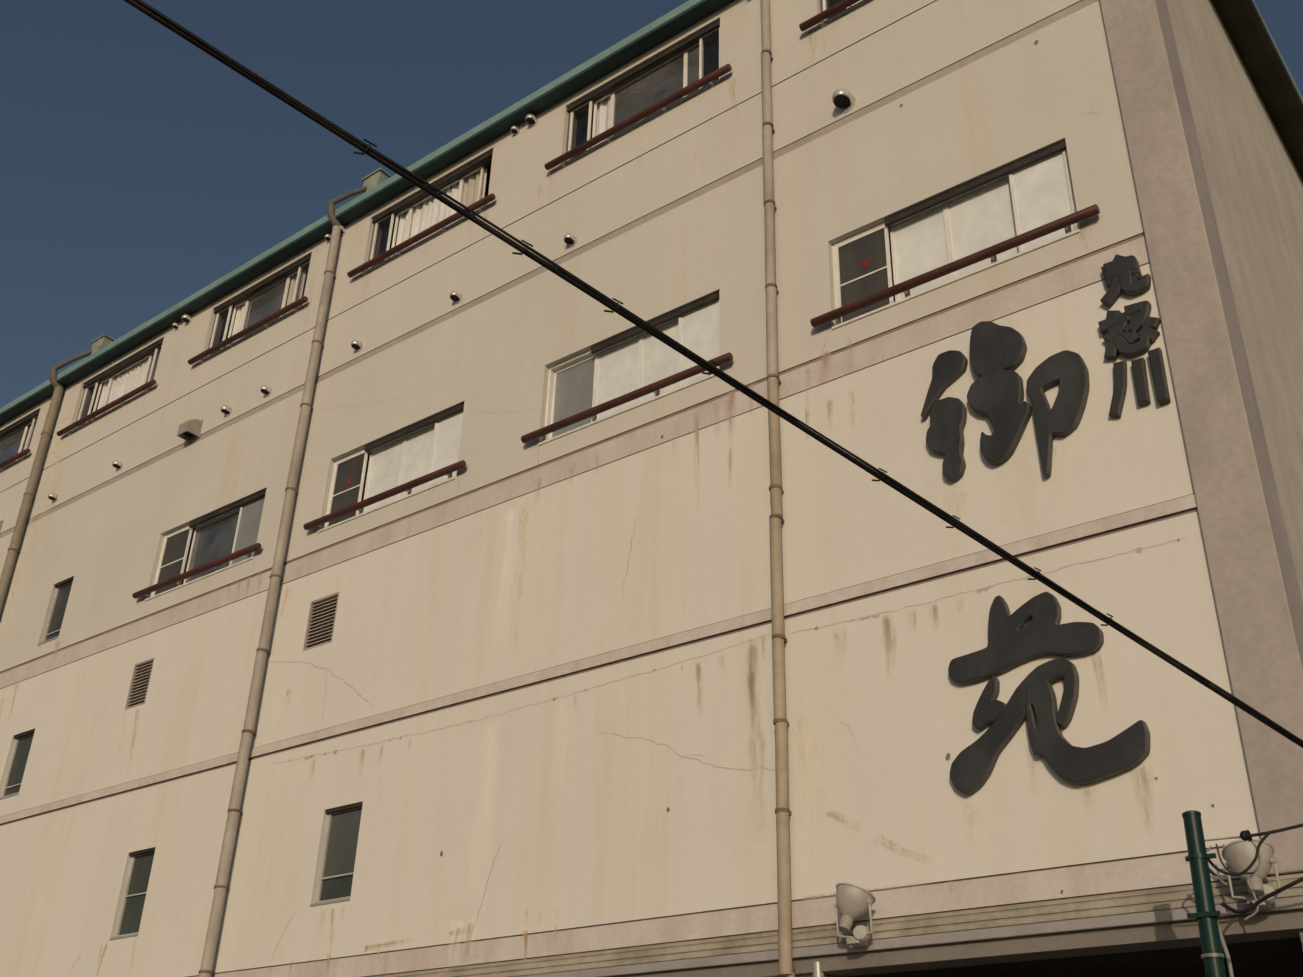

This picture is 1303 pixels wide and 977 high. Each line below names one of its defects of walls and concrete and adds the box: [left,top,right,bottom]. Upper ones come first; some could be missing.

crack [599,731,774,771]